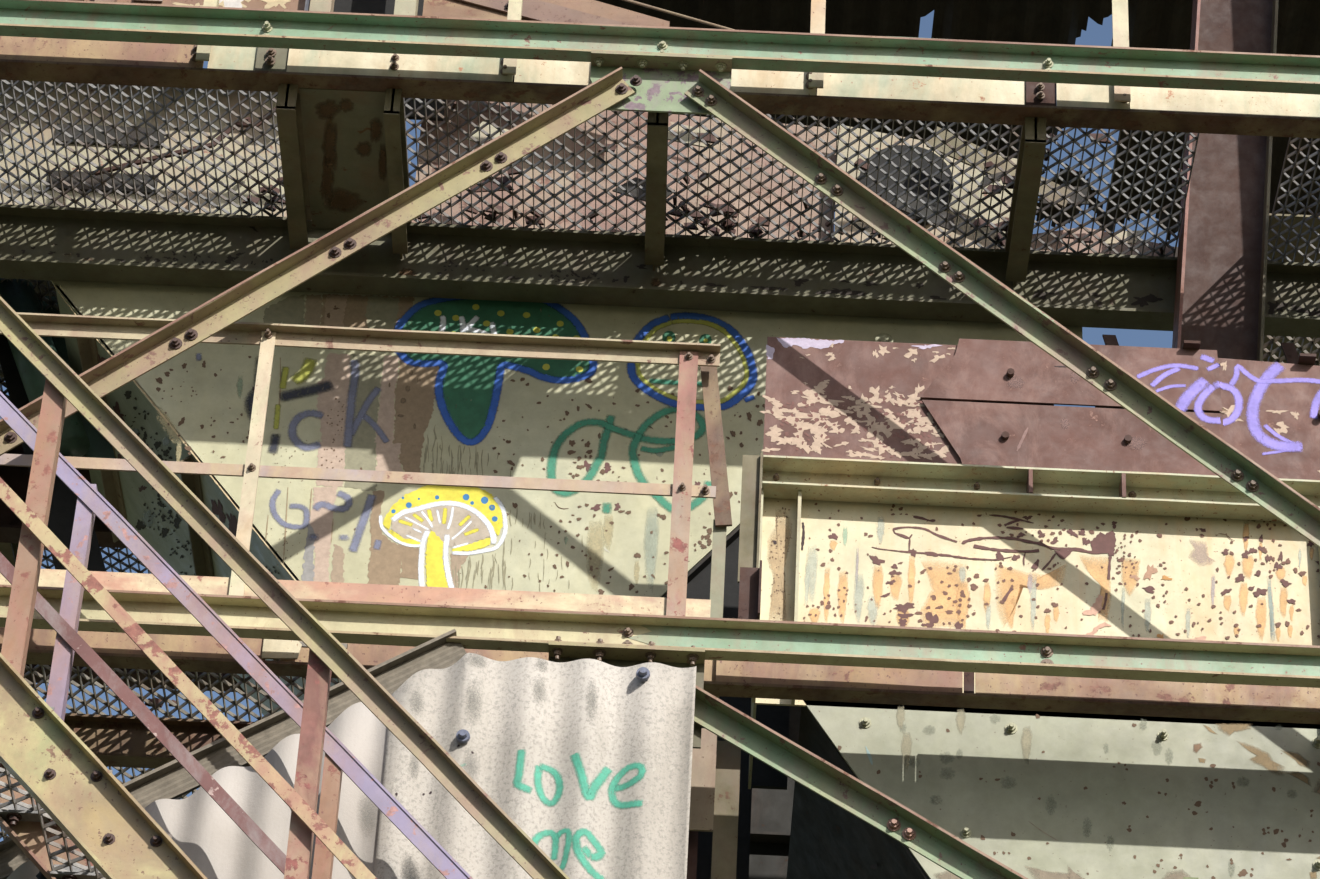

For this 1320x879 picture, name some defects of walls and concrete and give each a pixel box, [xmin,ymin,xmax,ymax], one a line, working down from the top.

rust [316,99,362,211]
rust [355,118,386,179]
peeling [766,337,844,361]
peeling [872,344,955,363]
rust [113,361,222,461]
peeling [760,380,949,460]
rust [136,485,195,575]
rust [508,503,631,595]